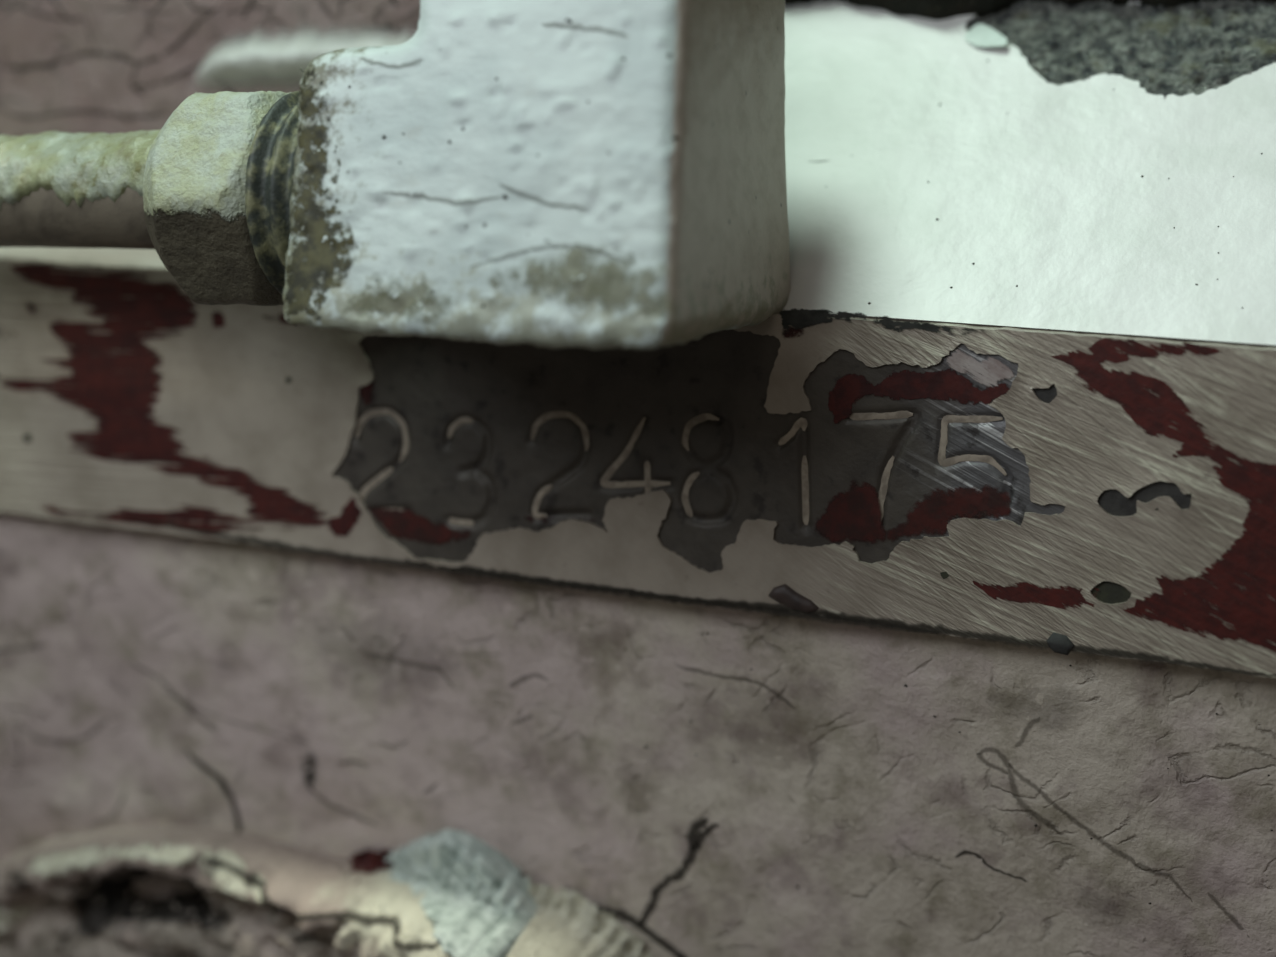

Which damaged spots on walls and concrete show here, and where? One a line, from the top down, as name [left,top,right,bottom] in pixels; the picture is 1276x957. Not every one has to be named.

crack [0,0,253,95]
peeling [333,308,1065,573]
peeling [1098,481,1192,516]
spalling [71,866,229,939]
peeling [385,829,539,957]
crack [595,818,718,957]
crack [955,851,1028,882]